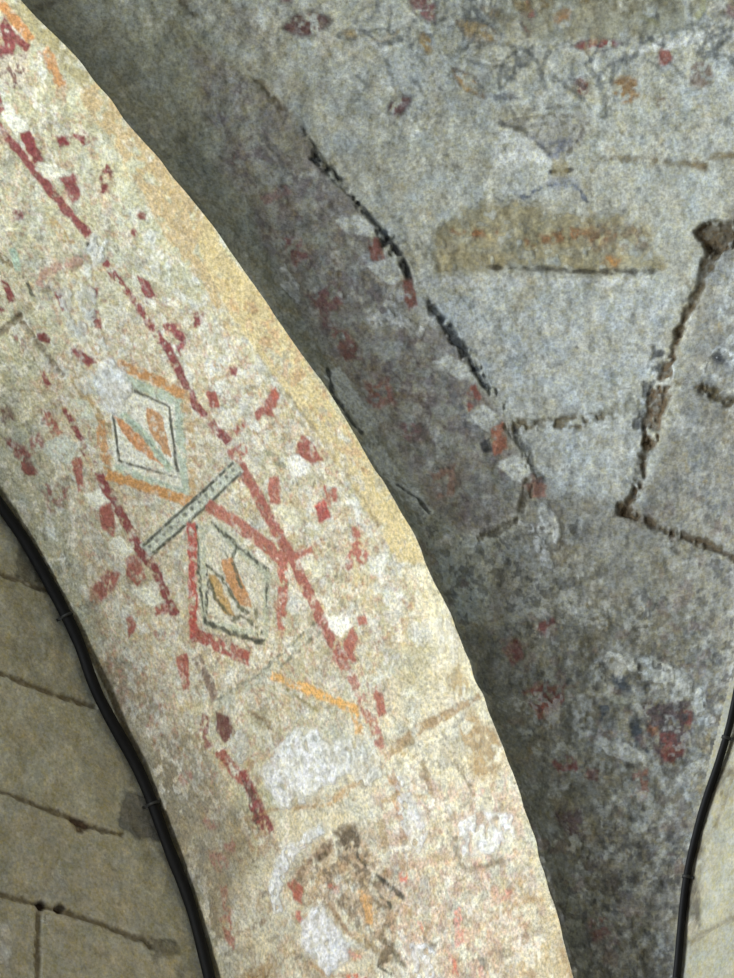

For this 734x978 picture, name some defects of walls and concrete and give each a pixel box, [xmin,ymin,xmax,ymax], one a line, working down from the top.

crack [304,130,412,279]
crack [684,152,734,170]
crack [428,301,497,394]
crack [617,220,734,561]